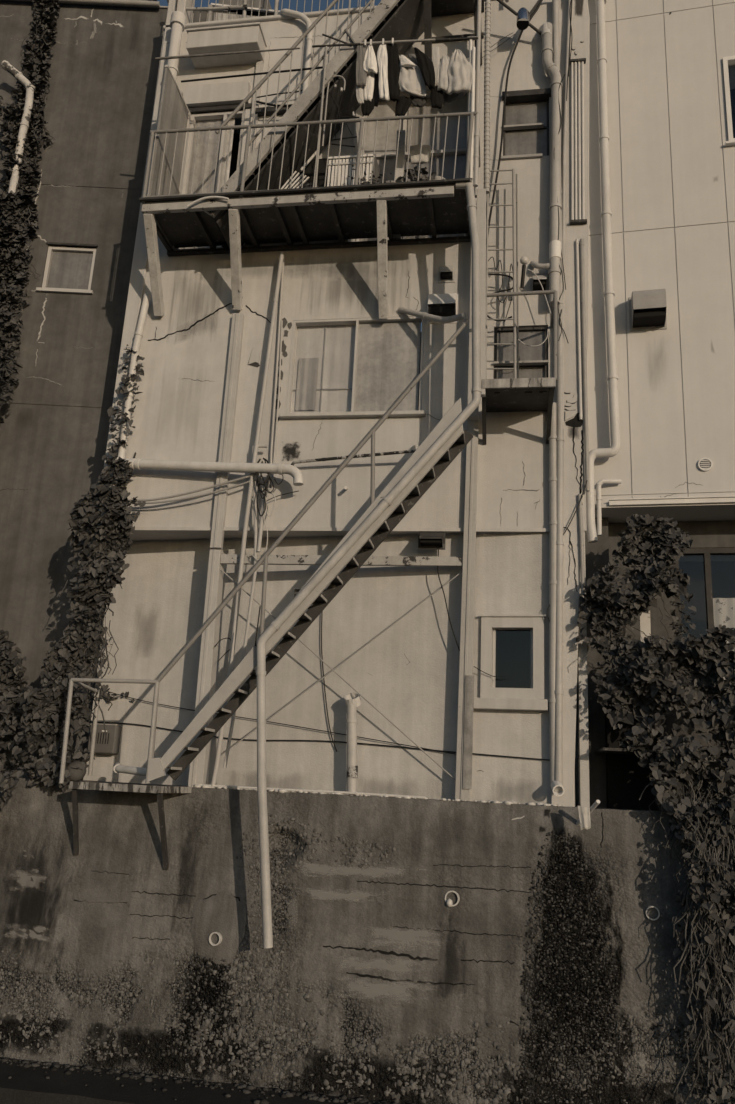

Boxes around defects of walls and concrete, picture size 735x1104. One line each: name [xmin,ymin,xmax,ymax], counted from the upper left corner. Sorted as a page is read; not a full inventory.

crack [56,13,122,45]
crack [35,169,70,203]
crack [22,235,70,385]
crack [148,303,271,341]
leakage [519,810,633,1097]